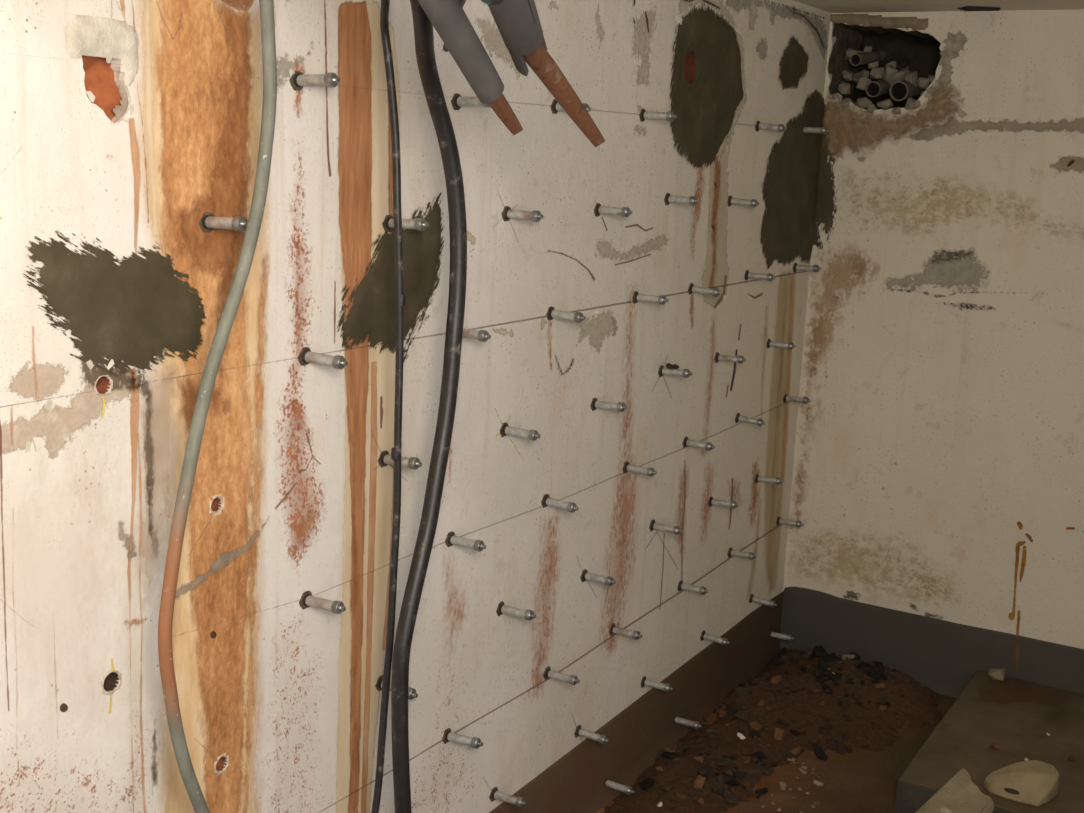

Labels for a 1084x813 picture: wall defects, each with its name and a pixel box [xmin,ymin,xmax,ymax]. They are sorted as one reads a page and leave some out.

spalling [64,15,139,123]
peeling [475,19,524,82]
peeling [631,0,657,86]
rust [129,119,149,251]
peeling [594,217,668,266]
spalling [676,0,1084,311]
peeling [1,357,148,459]
rust [278,154,323,563]
rust [324,0,399,813]
rust [128,368,142,592]
rust [1008,521,1033,636]
rust [271,621,319,813]